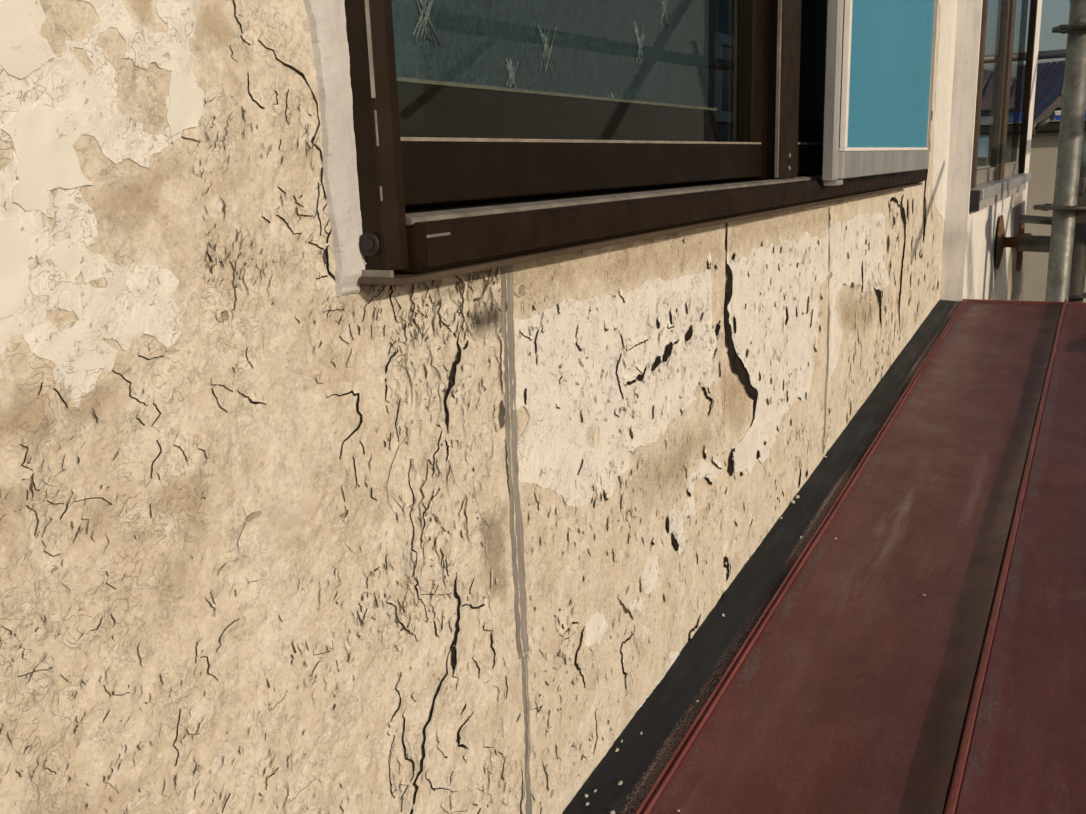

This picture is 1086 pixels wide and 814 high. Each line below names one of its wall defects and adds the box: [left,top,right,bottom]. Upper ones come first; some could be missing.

peeling [0,0,206,408]
crack [0,382,130,611]
crack [104,0,940,814]
peeling [494,269,717,507]
peeling [667,458,721,555]
peeling [731,212,890,475]
crack [0,723,89,814]
crack [0,619,240,727]